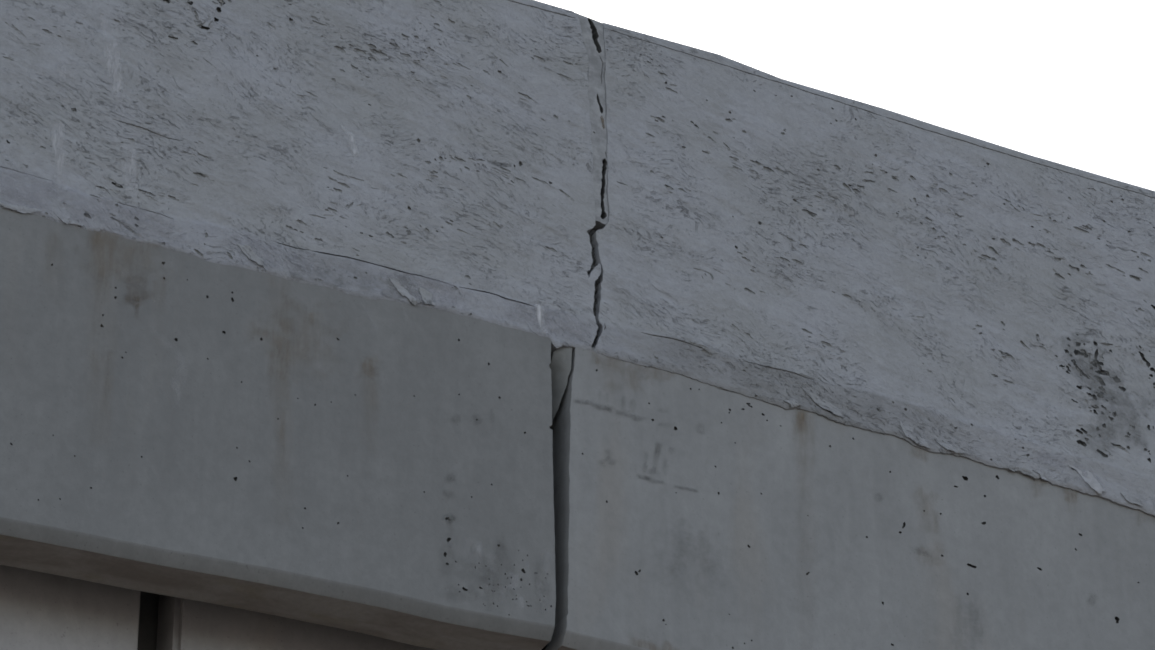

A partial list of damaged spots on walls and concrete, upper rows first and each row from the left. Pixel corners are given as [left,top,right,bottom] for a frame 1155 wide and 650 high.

spalling [91,177,179,238]
crack [587,152,607,347]
flaking render [892,401,966,454]
spalling [1020,334,1155,463]